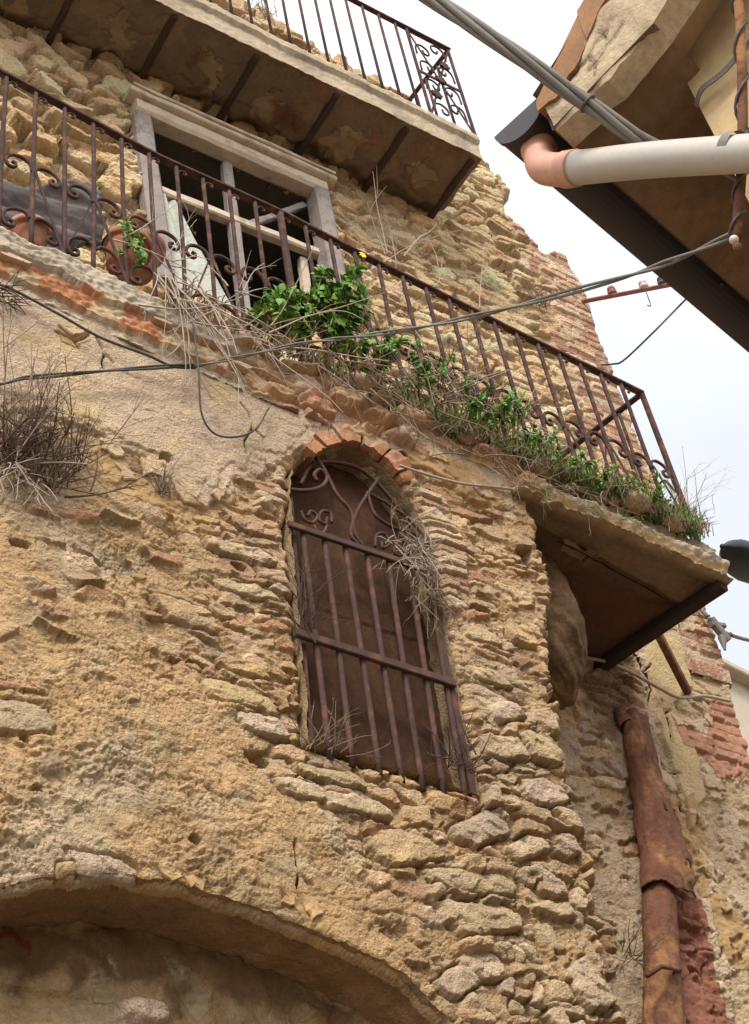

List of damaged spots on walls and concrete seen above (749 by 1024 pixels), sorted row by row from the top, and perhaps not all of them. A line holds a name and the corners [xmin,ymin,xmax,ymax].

flaking render [82,436,231,542]
crack [293,842,307,897]
spalling [671,699,749,970]
rust [677,888,733,1024]